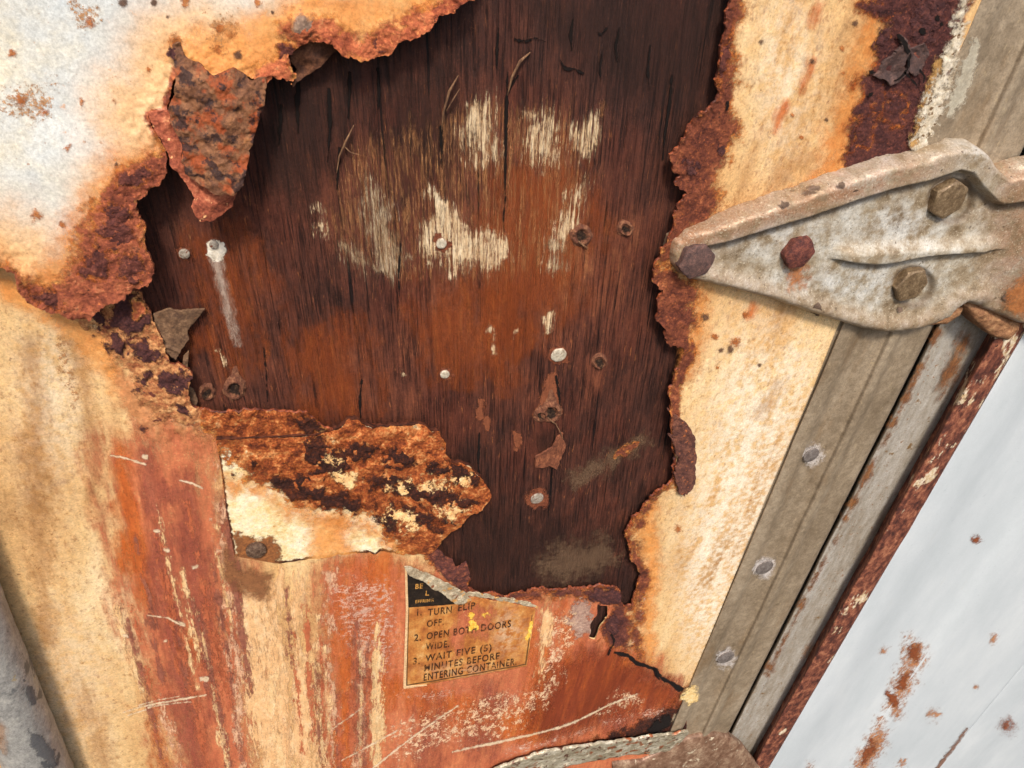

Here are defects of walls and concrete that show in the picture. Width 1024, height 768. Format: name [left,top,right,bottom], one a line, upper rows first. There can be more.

peeling [148,42,267,222]
corrosion [776,102,794,129]
corrosion [813,0,976,178]
corrosion [0,0,748,768]
peeling [475,398,491,431]
peeling [513,431,522,452]
peeling [614,441,639,459]
corrosion [939,333,970,400]
peeling [209,499,585,768]
crack [608,634,684,692]
peeling [158,701,183,768]
corrosion [853,635,929,768]